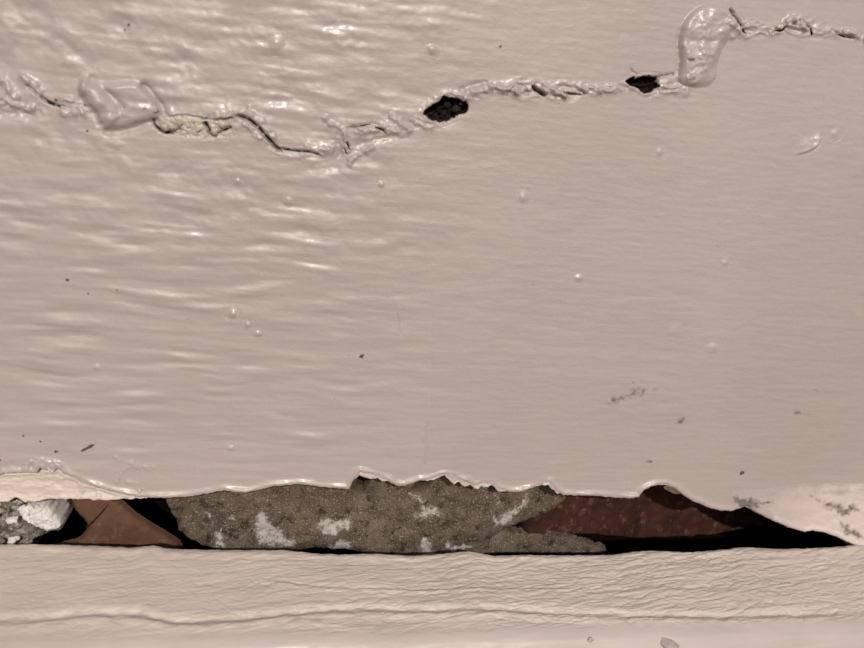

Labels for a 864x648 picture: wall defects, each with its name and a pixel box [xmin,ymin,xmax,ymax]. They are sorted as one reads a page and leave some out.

crack [731,8,864,59]
hole [625,76,660,94]
crack [0,79,93,130]
crack [122,66,701,176]
hole [423,96,469,122]
peeling [354,472,393,484]
peeling [425,474,507,492]